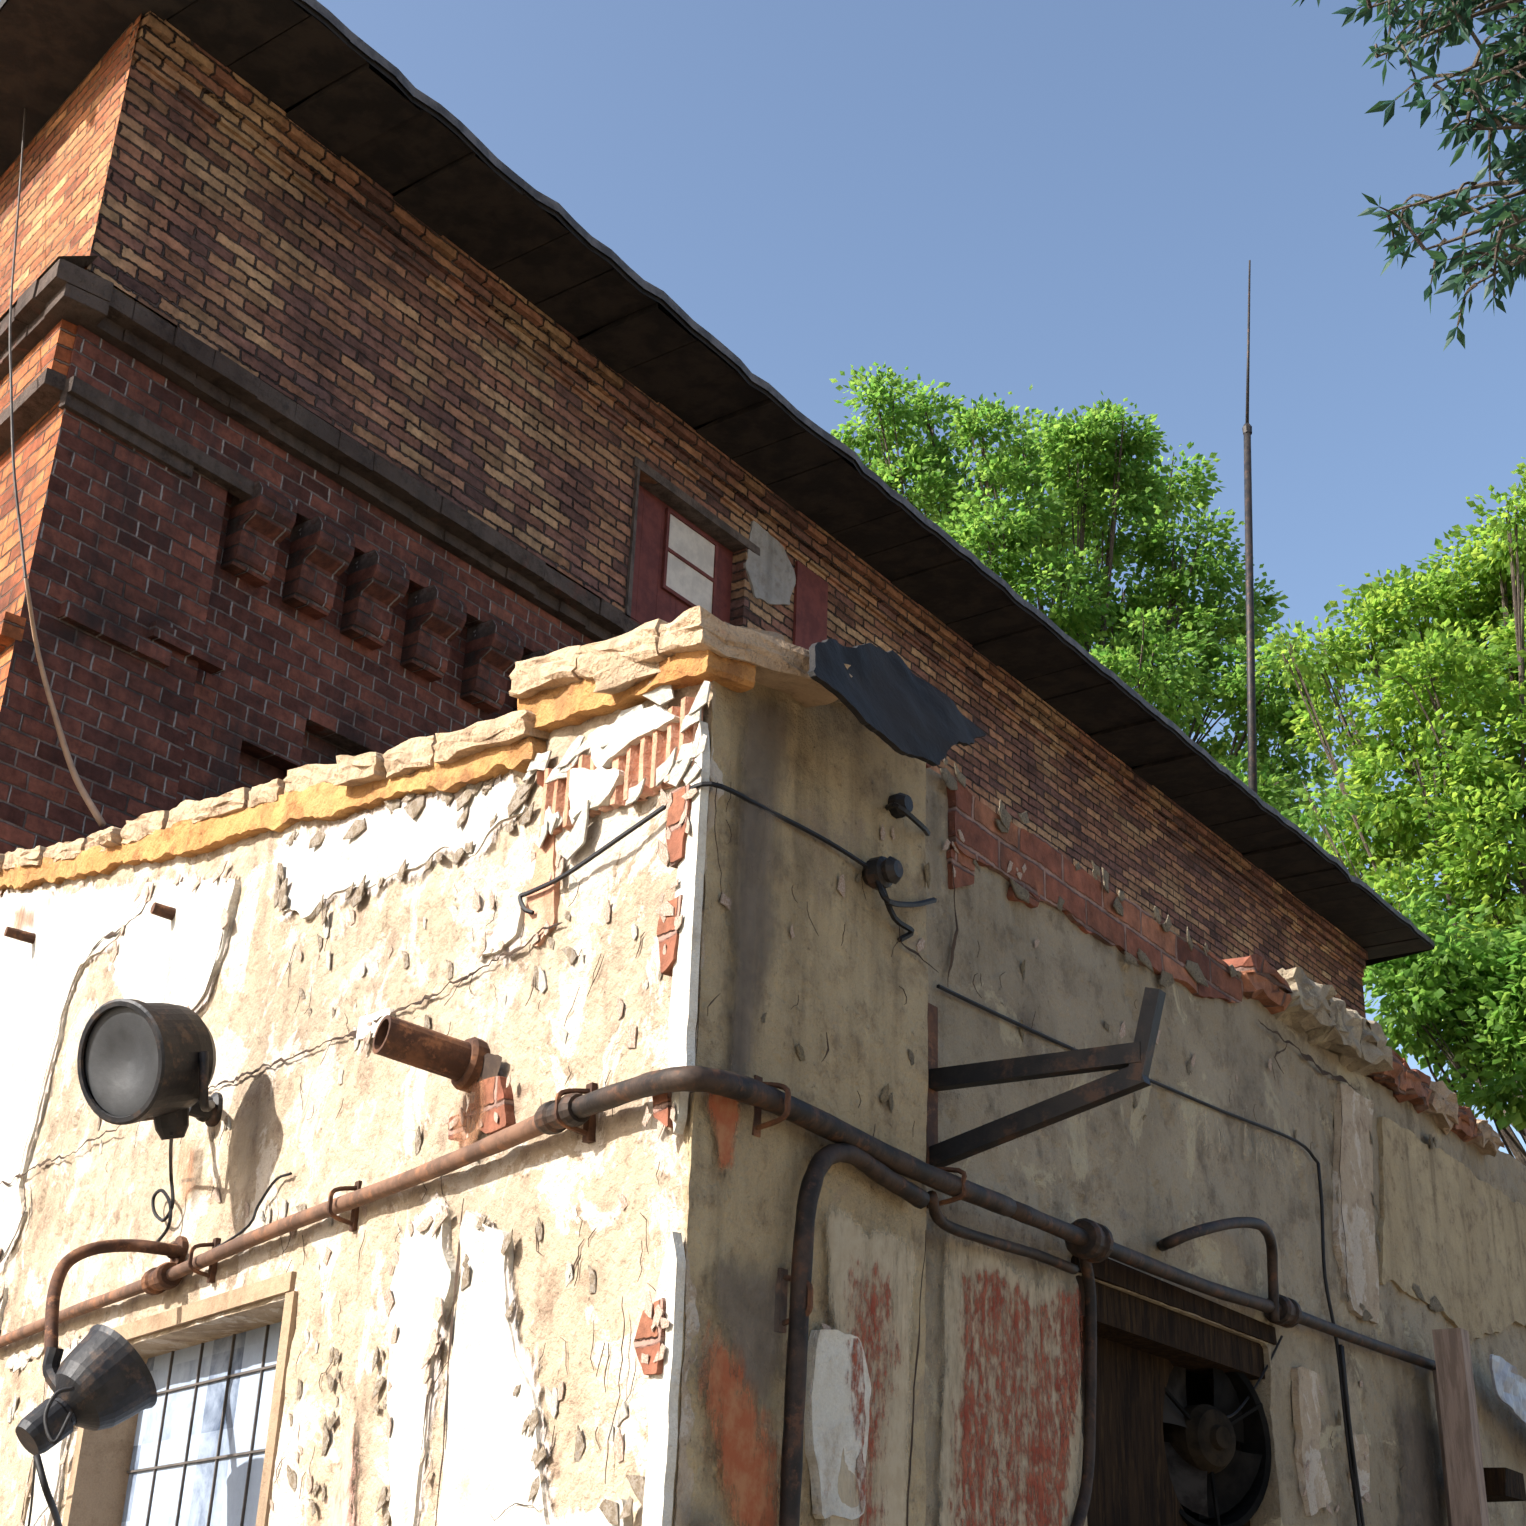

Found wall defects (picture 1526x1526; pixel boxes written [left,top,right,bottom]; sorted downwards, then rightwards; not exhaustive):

flaking render [274,680,711,1048]
flaking render [924,759,1244,1003]
crack [0,896,153,1261]
flaking render [0,861,242,1330]
flaking render [332,1003,396,1053]
flaking render [1332,1083,1526,1344]
flaking render [0,1330,86,1526]
peeling [270,1329,354,1526]
flaking render [371,1178,670,1526]
corrosion [700,1322,781,1526]
peeling [804,1209,915,1526]
flaking render [1291,1366,1382,1516]